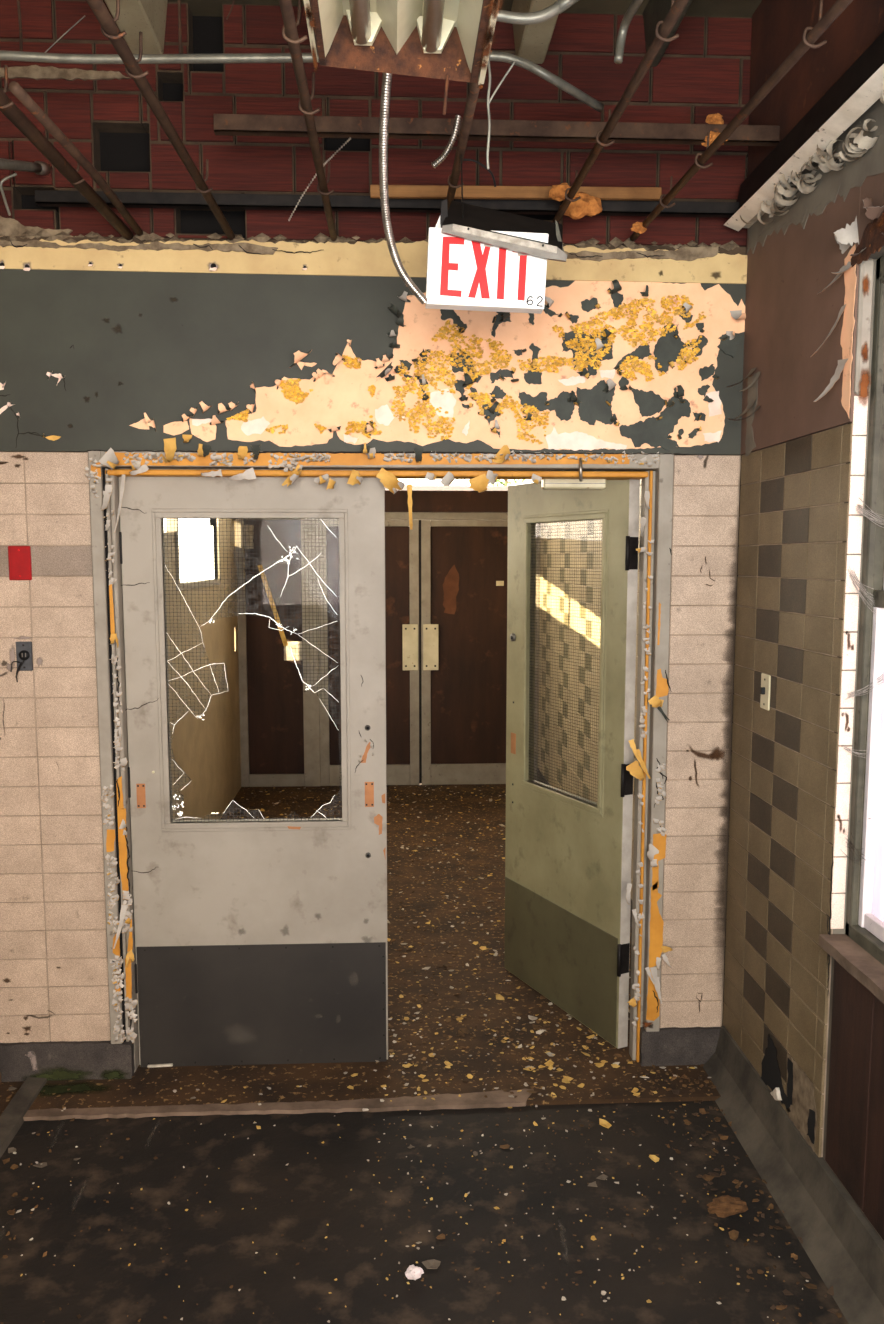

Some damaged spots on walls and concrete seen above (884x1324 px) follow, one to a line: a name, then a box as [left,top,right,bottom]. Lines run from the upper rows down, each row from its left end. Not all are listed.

spalling [193,16,224,72]
spalling [163,83,183,101]
spalling [99,132,150,172]
spalling [325,138,370,151]
peeling [740,90,884,236]
spalling [0,210,321,271]
spalling [564,246,718,262]
peeling [84,280,761,1043]
spalling [761,1034,817,1152]